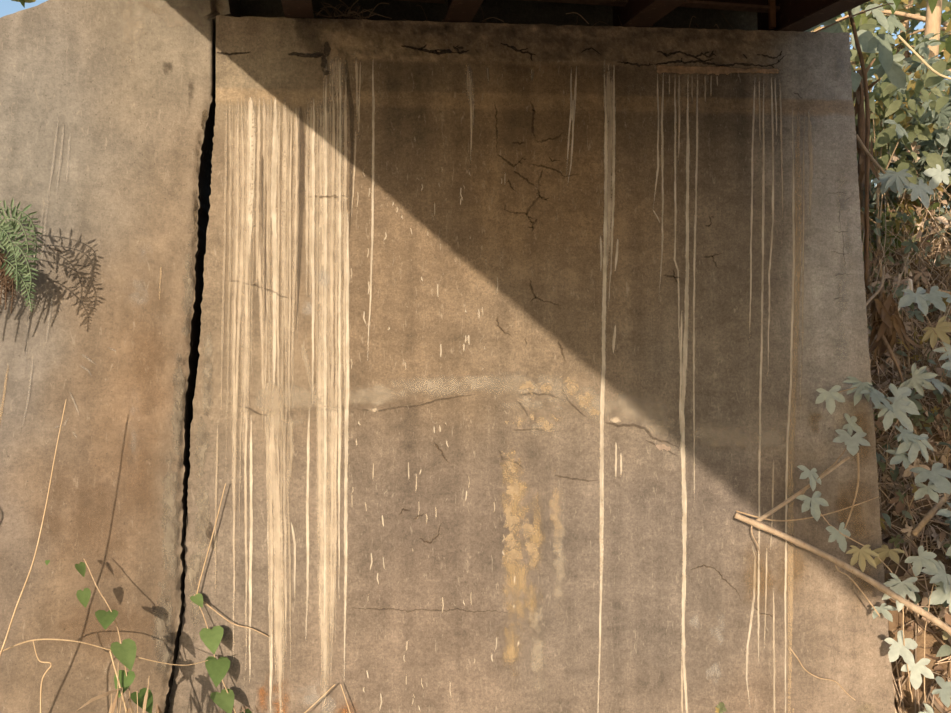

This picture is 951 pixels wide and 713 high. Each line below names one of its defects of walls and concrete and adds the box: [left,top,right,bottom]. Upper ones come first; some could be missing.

crack [402,45,469,55]
crack [501,43,536,60]
crack [581,47,784,68]
water stain [460,66,474,205]
crack [495,105,563,231]
water stain [153,19,387,713]
water stain [372,368,491,412]
water stain [505,63,622,713]
water stain [653,65,813,713]
water stain [494,451,542,619]
water stain [491,629,519,662]